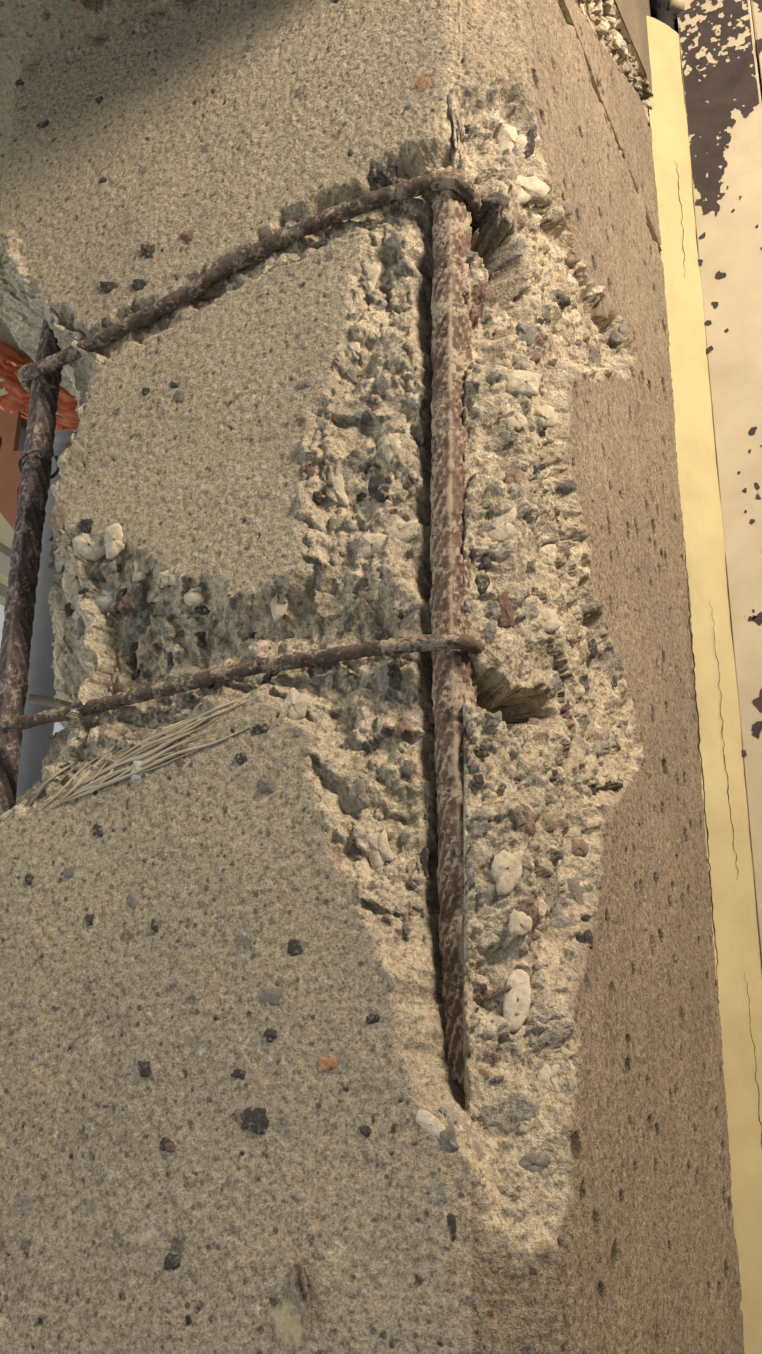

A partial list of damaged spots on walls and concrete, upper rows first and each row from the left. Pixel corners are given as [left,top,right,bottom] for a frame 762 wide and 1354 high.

spalling [80,0,161,14]
spalling [576,0,654,125]
peeling [678,0,762,216]
peeling [737,471,761,524]
peeling [744,609,762,625]
spalling [0,70,646,1267]
peeling [751,688,762,739]